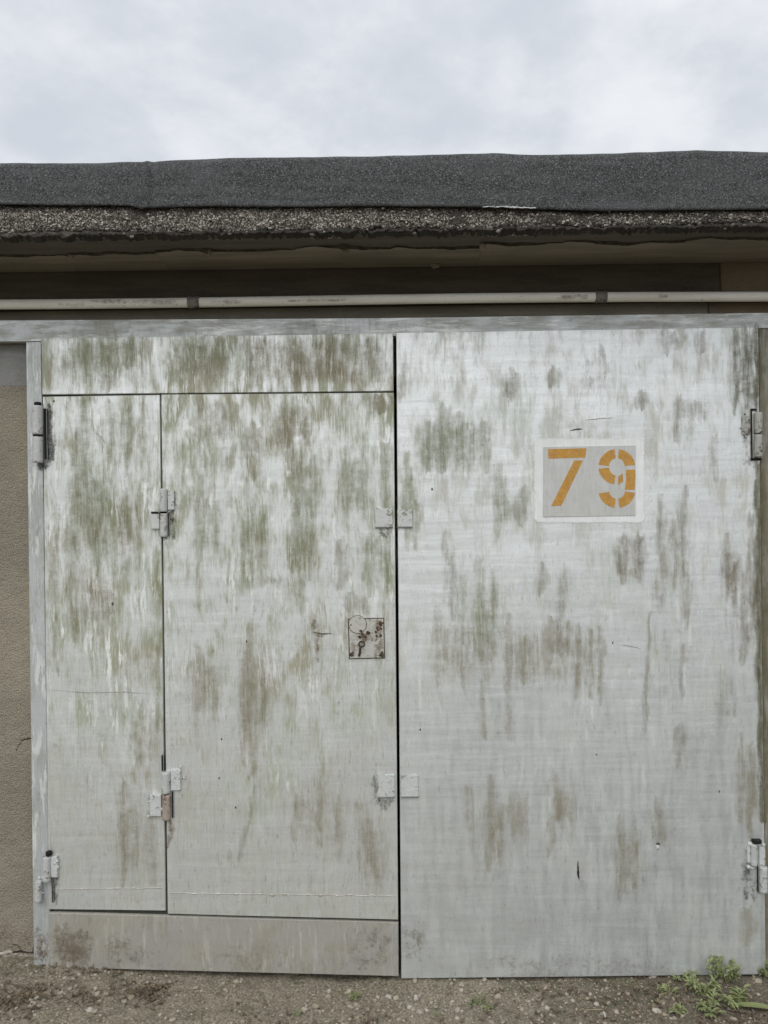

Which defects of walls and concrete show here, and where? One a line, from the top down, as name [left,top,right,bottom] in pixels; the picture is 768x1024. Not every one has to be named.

damp [37,404,54,469]